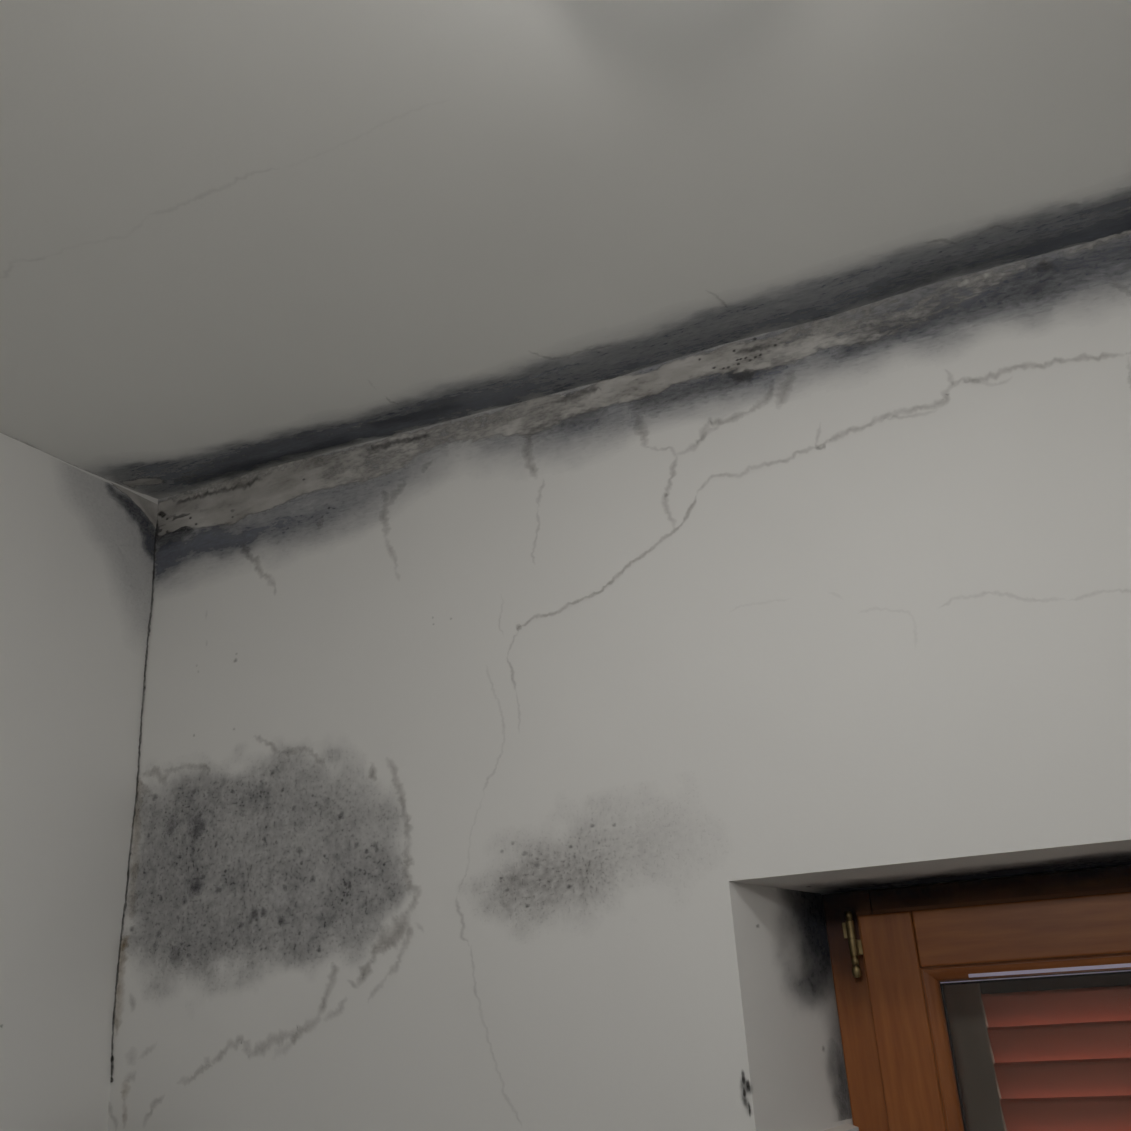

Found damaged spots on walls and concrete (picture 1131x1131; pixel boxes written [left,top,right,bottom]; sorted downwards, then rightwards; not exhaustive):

water stain [109,195,1131,581]
water stain [136,769,400,965]
water stain [785,853,1131,996]